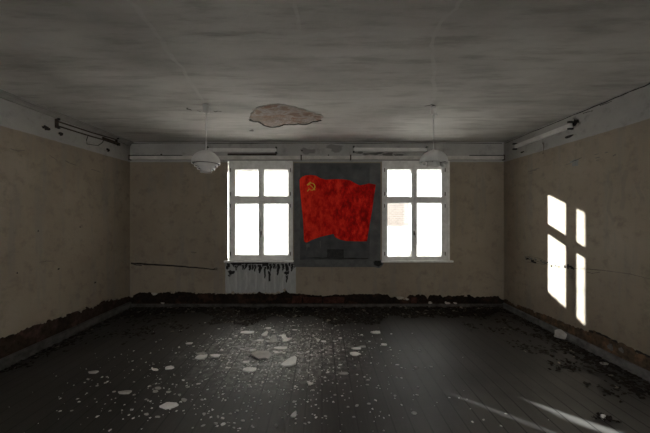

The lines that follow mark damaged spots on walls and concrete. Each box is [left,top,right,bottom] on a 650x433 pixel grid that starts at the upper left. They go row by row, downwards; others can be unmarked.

flaking render [249,103,324,131]
crack [131,262,217,270]
crack [525,256,641,277]
flaking render [0,289,650,371]